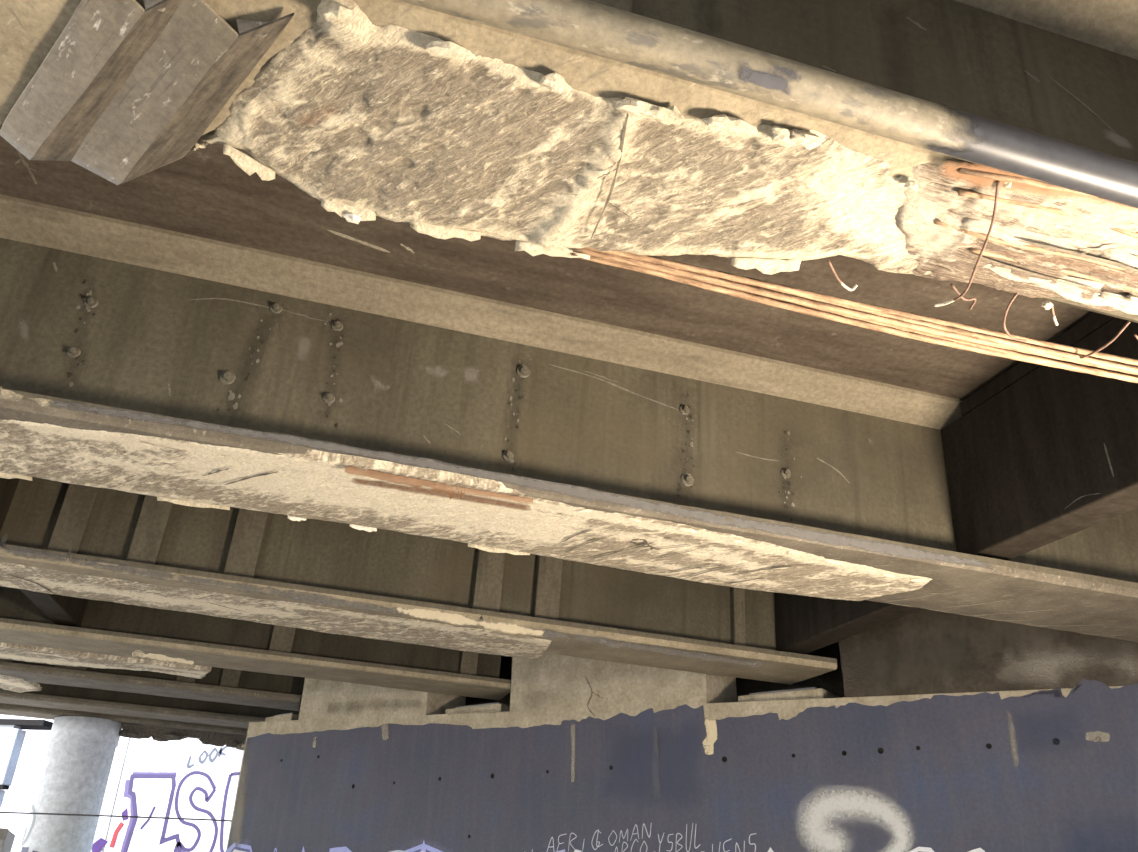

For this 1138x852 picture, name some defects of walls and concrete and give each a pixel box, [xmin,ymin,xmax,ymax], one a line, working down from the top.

spalling [191,0,1138,315]
rust [944,164,1138,209]
rust [345,466,533,510]
spalling [0,398,988,601]
spalling [0,536,762,667]
spalling [0,642,212,679]
spalling [0,675,42,693]
peeling [702,719,717,755]
peeling [1086,731,1110,742]